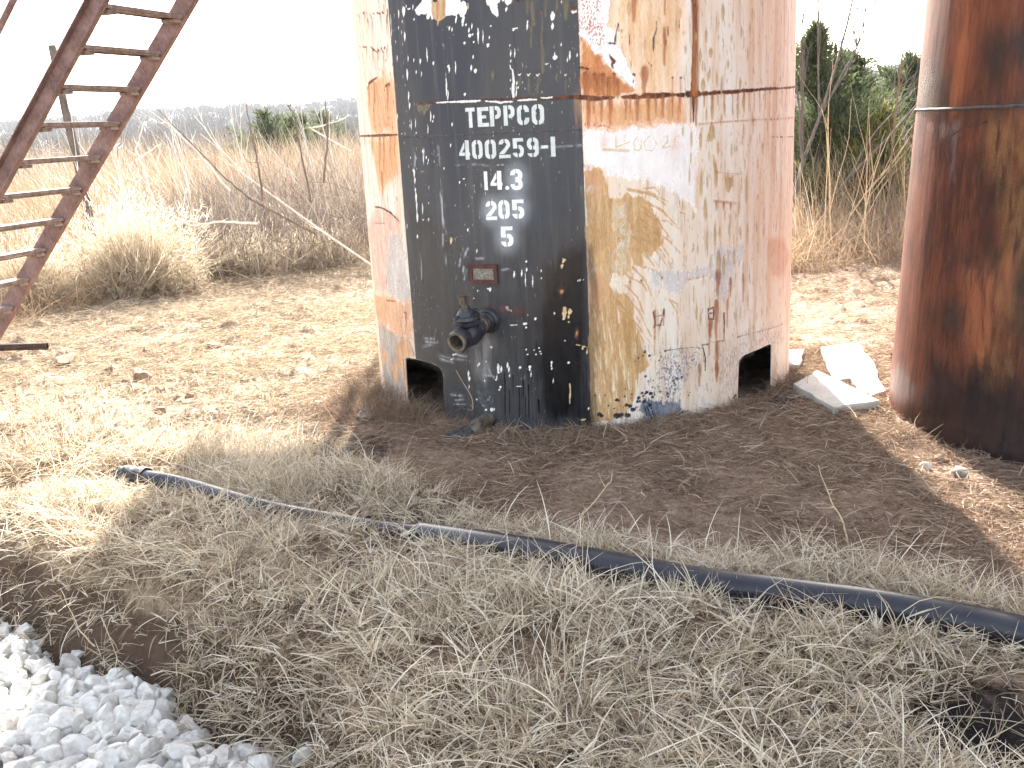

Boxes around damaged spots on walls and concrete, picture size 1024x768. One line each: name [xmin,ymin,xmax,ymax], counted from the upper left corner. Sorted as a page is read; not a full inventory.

peeling [390,0,512,73]
rust [415,0,795,131]
rust [951,0,969,107]
rust [359,46,415,400]
peeling [467,347,554,391]
peeling [554,307,588,354]
peeling [581,346,700,422]
rust [965,261,1010,358]